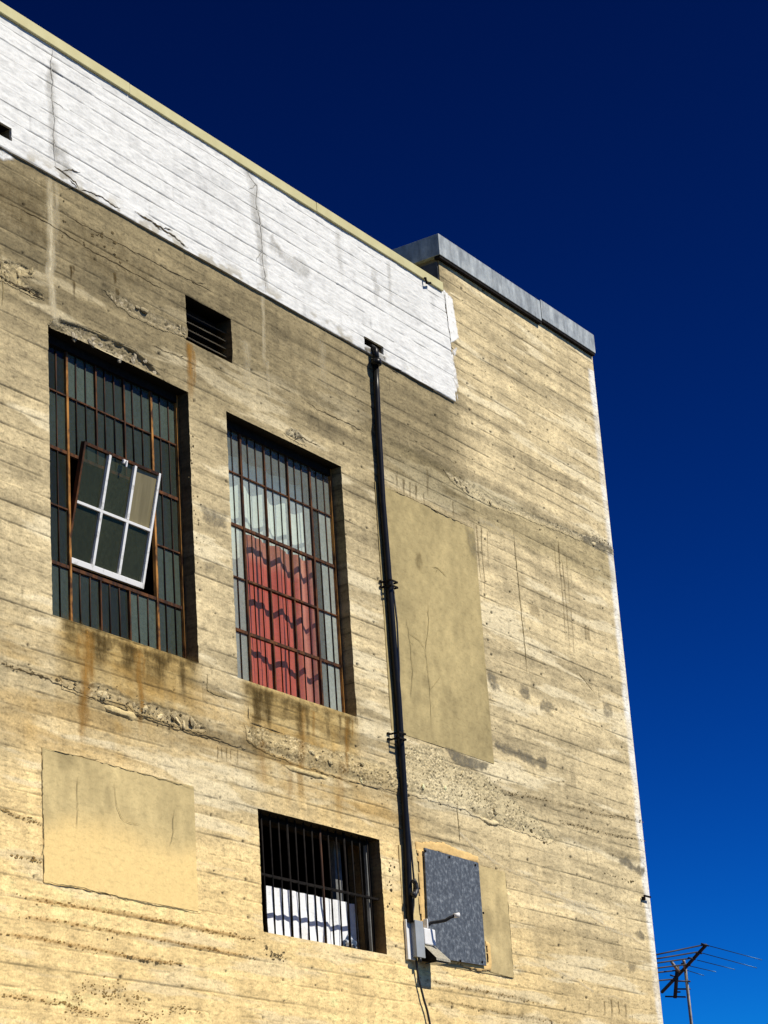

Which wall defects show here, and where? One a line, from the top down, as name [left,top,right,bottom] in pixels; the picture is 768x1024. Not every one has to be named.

crack [3,53,214,293]
crack [248,173,266,289]
spalling [0,258,45,300]
spalling [48,318,165,381]
water stain [66,621,171,677]
spalling [2,662,207,734]
spalling [244,723,641,845]